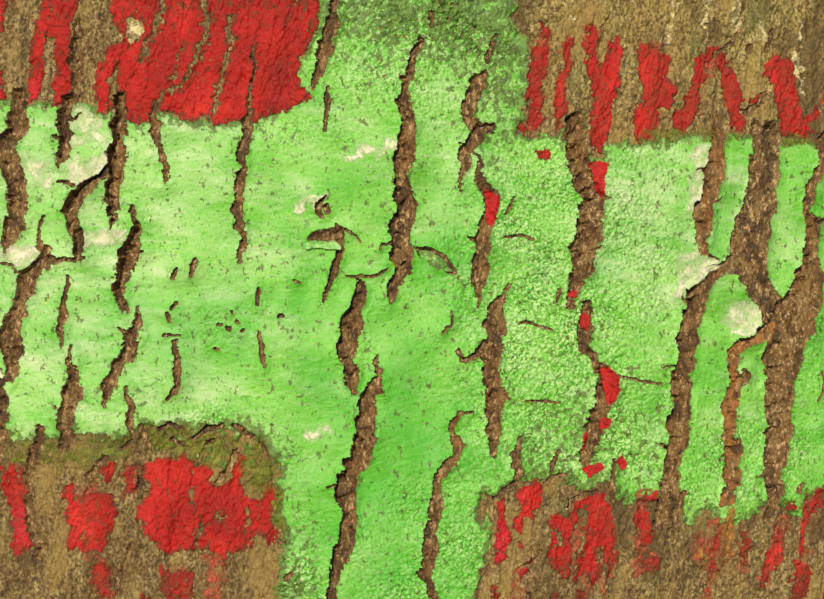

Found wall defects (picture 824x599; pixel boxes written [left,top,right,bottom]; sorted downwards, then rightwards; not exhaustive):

spalling [124,17,145,45]
peeling [517,22,624,153]
crack [0,0,274,564]
crack [322,0,441,599]
crack [416,33,561,599]
crack [543,111,726,546]
crack [718,131,824,524]
peeling [0,462,32,557]
peeling [61,461,136,599]
peeling [158,563,195,599]
peeling [492,477,543,566]
peeling [547,492,620,599]